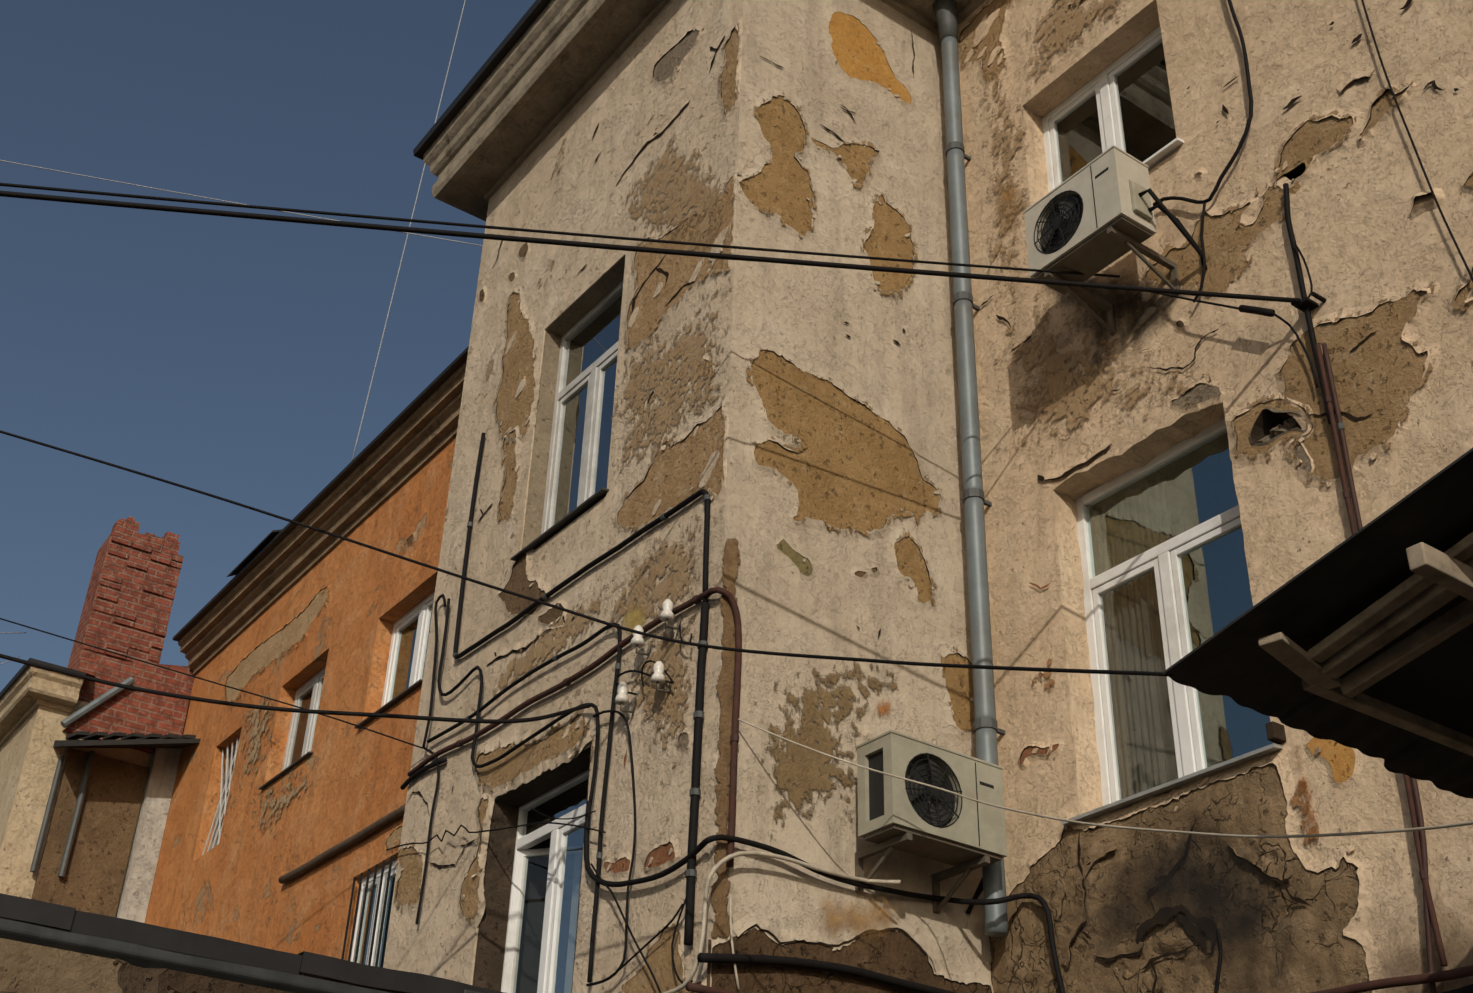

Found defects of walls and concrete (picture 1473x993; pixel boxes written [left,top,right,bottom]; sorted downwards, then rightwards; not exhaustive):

crack [592,35,725,185]
peeling [492,6,946,768]
water stain [1057,276,1174,365]
flaking render [958,0,1473,492]
peeling [222,581,332,837]
flaking render [618,538,1387,993]
peeling [602,836,681,879]
crack [1062,831,1218,993]
crack [1167,816,1311,906]